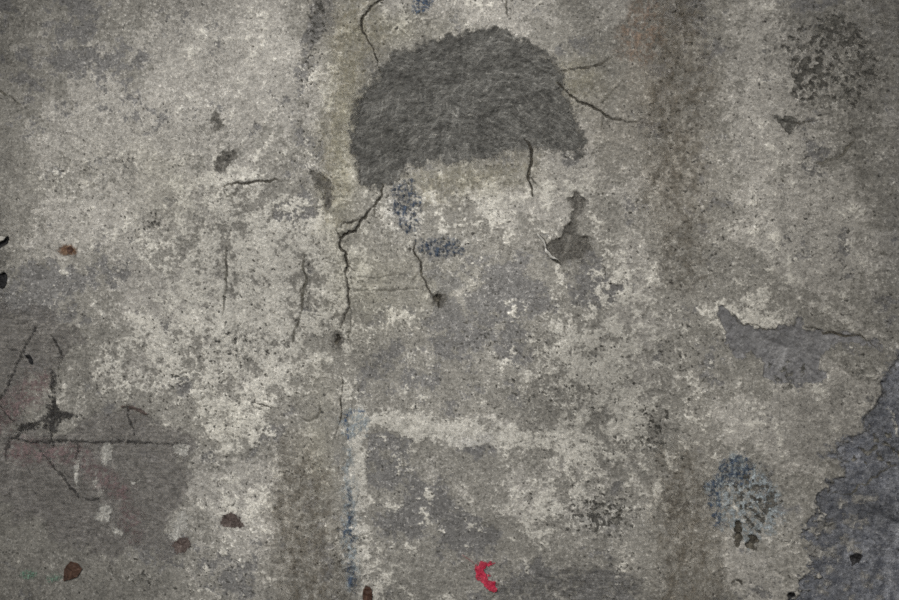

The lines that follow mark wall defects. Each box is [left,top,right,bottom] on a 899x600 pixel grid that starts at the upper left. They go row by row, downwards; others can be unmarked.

crack [355,0,381,73]
crack [557,54,637,126]
crack [524,139,538,197]
corrosion [59,245,77,255]
crack [336,185,436,340]
peeling [717,298,883,392]
flaking render [725,474,783,550]
flaking render [787,350,899,600]